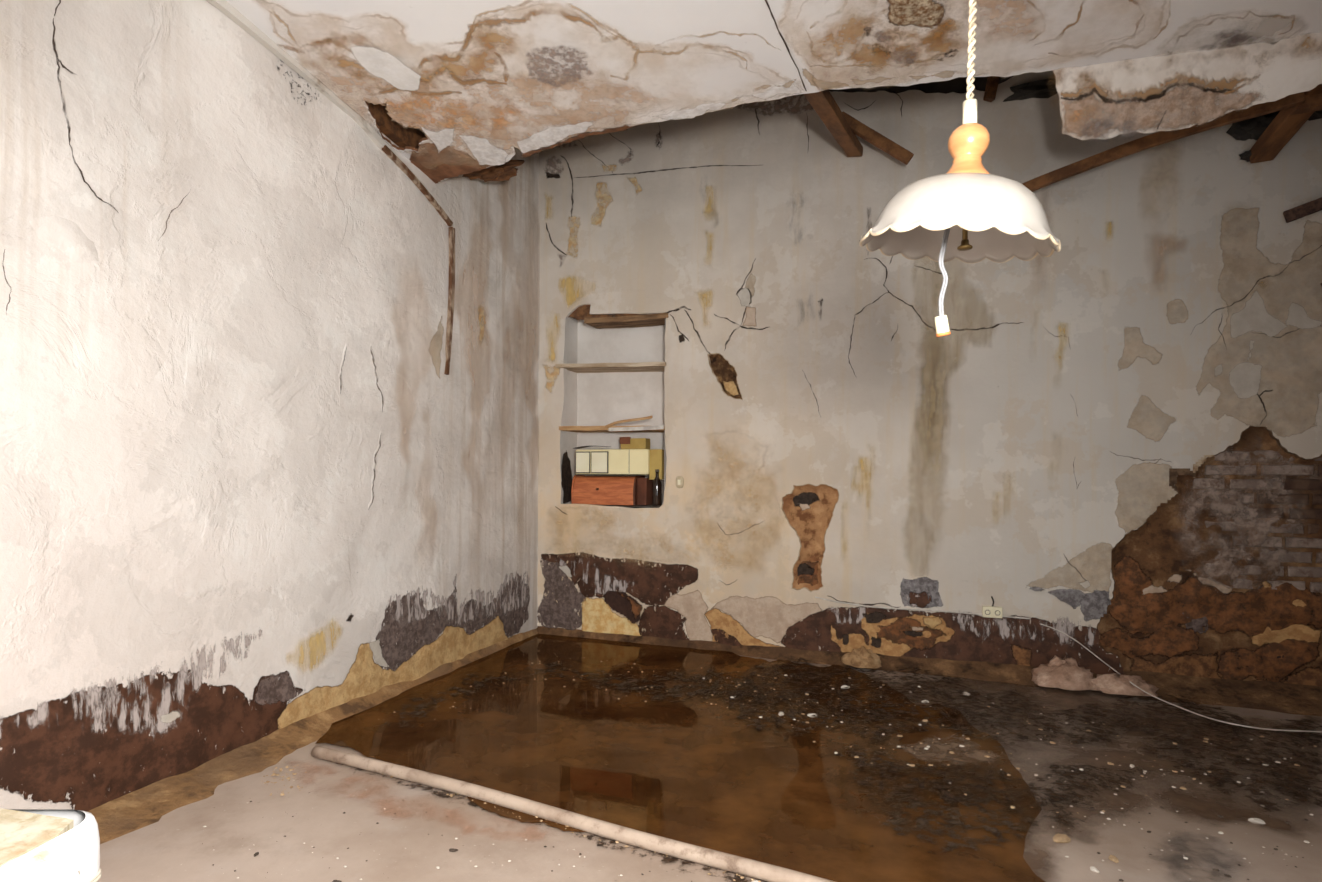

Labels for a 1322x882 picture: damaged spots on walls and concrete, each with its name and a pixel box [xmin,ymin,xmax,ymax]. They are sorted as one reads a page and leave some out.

crack [51,0,119,213]
damp [275,14,321,105]
damp [316,6,645,158]
damp [818,18,955,68]
spalling [559,153,633,264]
crack [848,256,1071,375]
peeling [0,208,1322,812]
peeling [1096,737,1221,833]